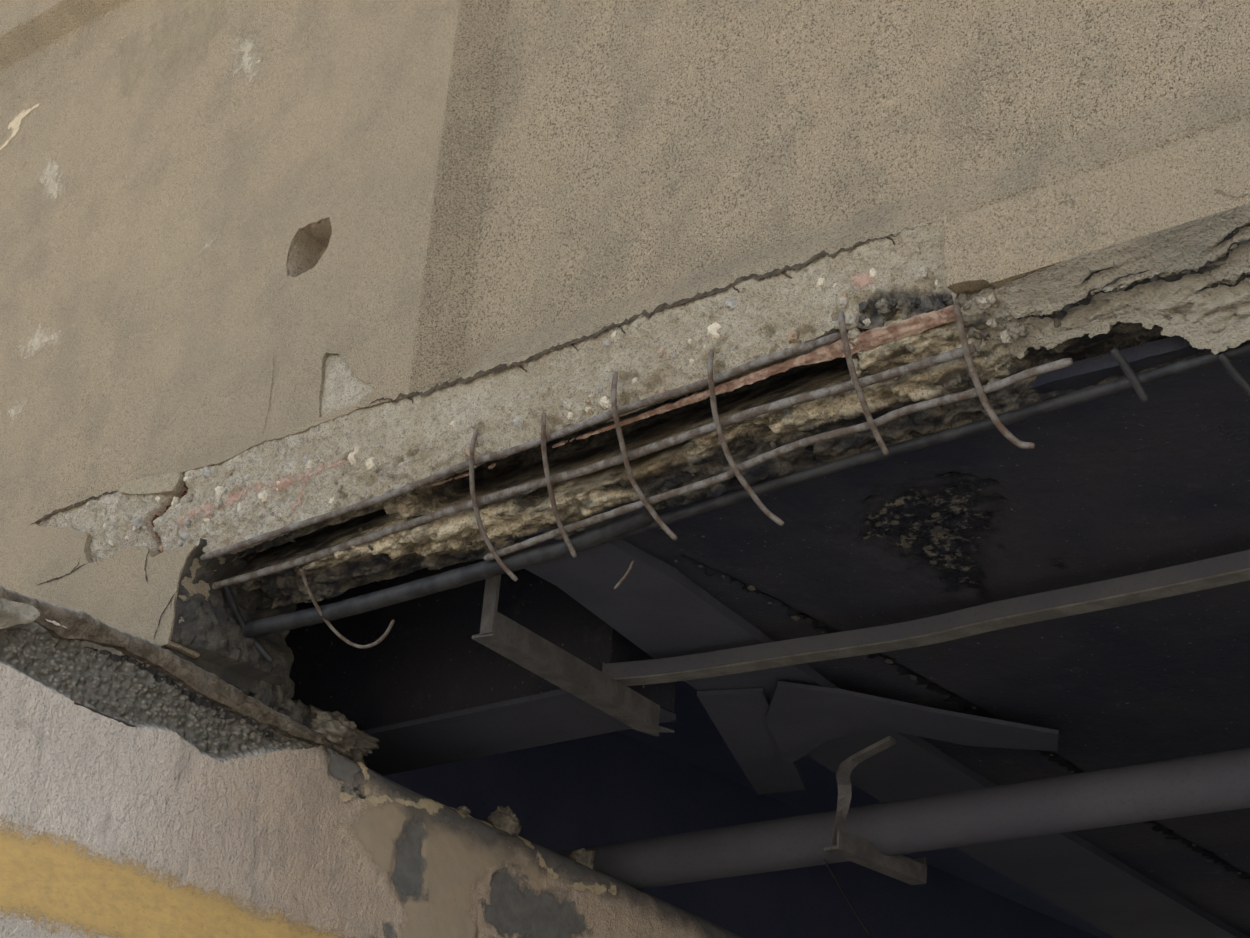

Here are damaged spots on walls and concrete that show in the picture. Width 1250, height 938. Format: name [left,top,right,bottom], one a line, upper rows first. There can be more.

crack [1017,189,1250,319]
spalling [38,215,1250,612]
rust [552,305,956,448]
spalling [0,621,320,763]
peeling [339,762,617,896]